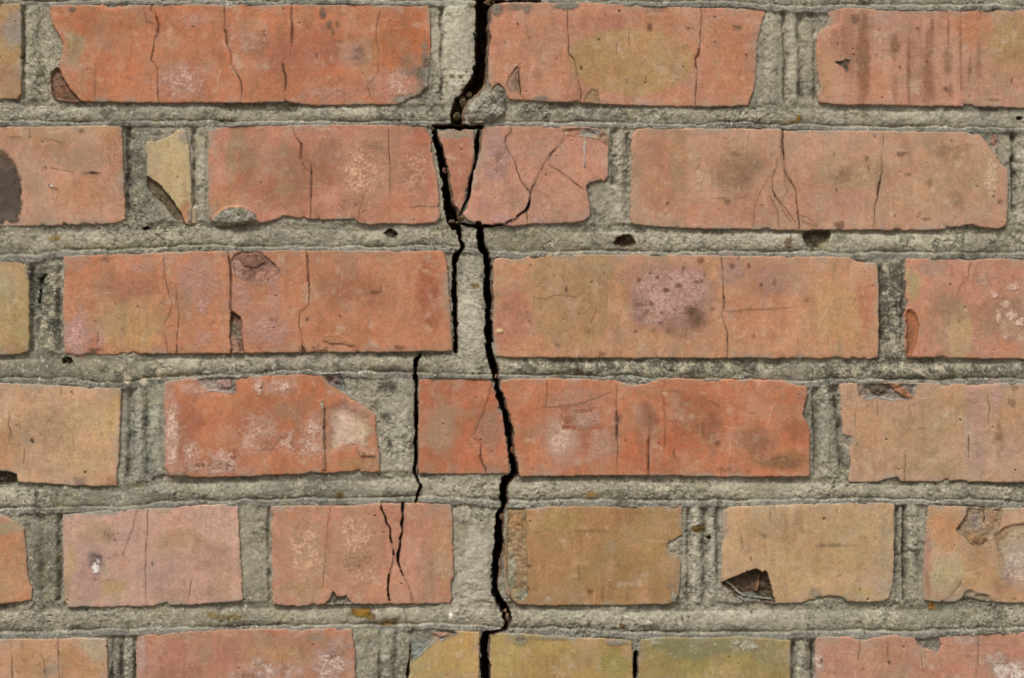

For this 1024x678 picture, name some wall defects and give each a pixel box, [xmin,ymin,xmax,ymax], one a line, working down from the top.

spalling [50,68,84,103]
spalling [0,151,21,224]
spalling [147,176,192,224]
spalling [229,310,244,353]
crack [388,0,583,678]
crack [380,356,422,678]
spalling [721,569,775,604]